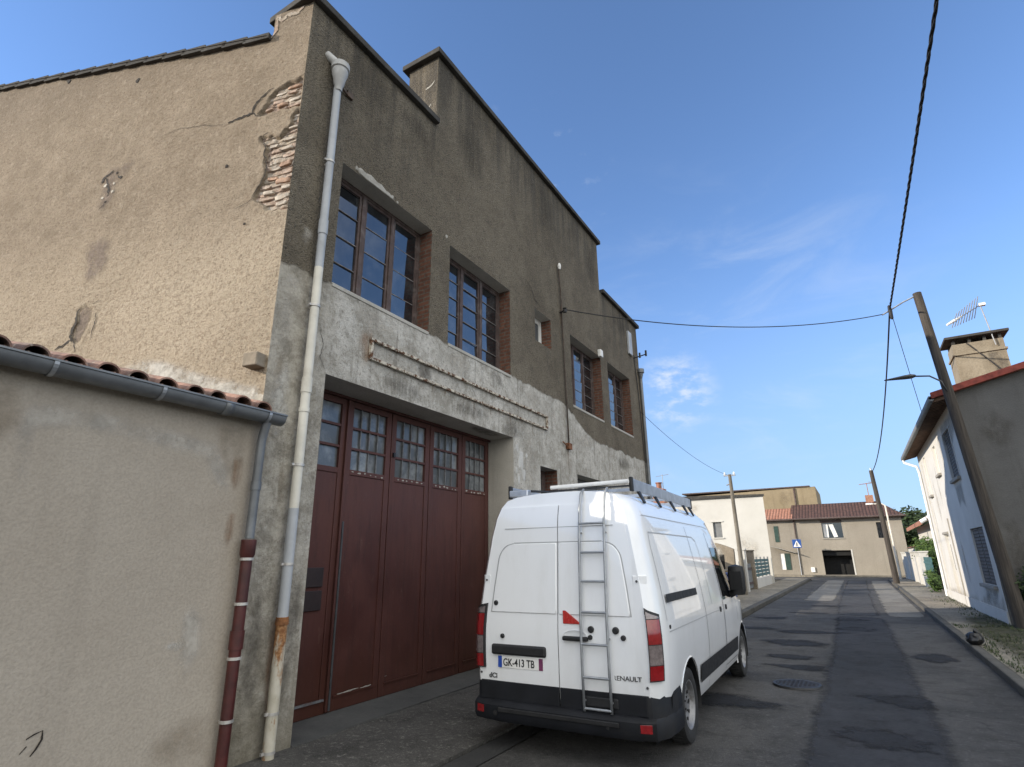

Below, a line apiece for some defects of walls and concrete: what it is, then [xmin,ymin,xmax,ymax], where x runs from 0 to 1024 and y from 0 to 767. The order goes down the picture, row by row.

spalling [99,170,123,209]
crack [179,88,273,208]
spalling [256,80,303,211]